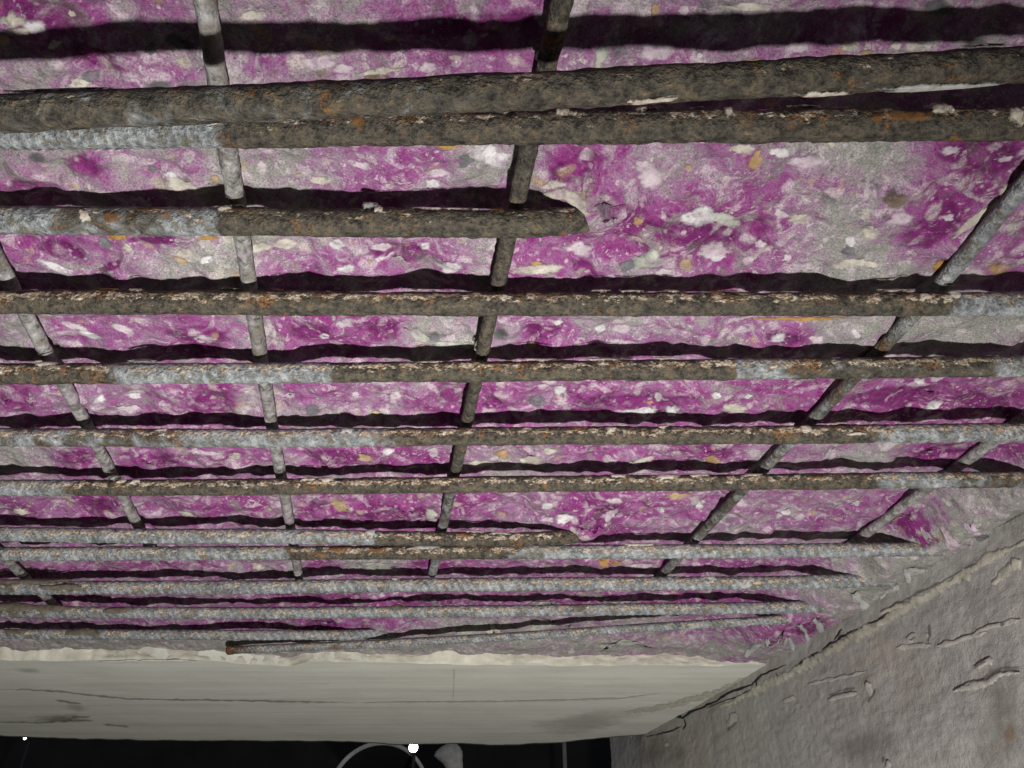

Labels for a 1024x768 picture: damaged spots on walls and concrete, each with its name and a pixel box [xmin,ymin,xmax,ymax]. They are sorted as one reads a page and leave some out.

spalling [0,0,1024,293]
spalling [0,200,1024,666]
crack [647,564,971,737]